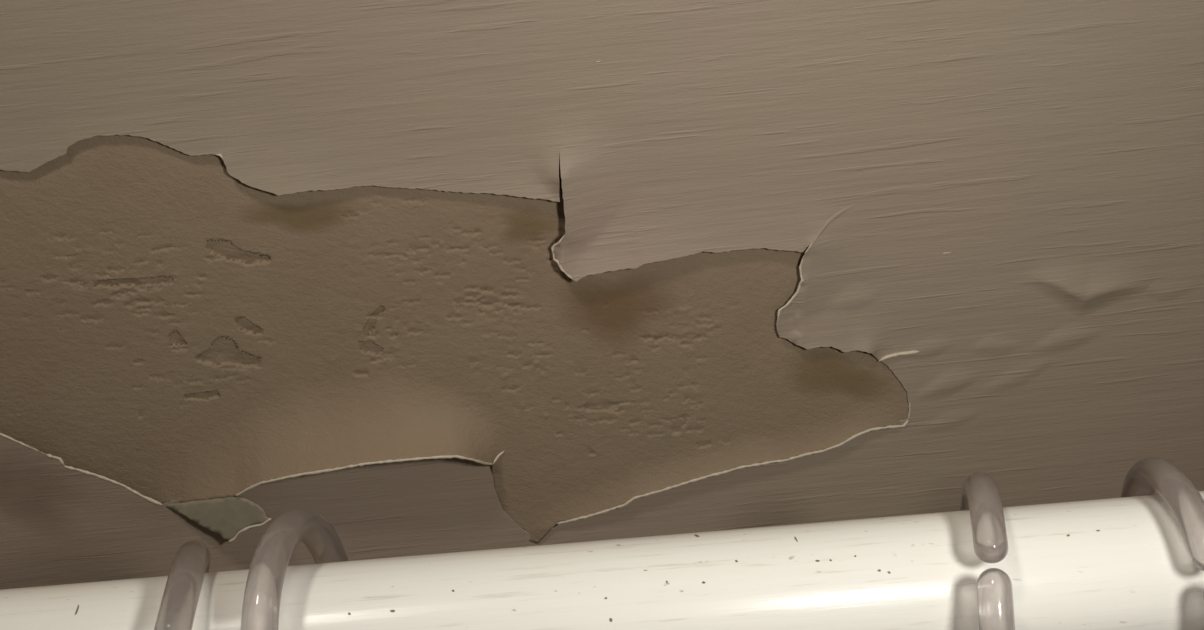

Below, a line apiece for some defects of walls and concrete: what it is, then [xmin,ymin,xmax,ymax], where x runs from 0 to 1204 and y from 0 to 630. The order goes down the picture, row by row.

peeling [0,38,992,583]